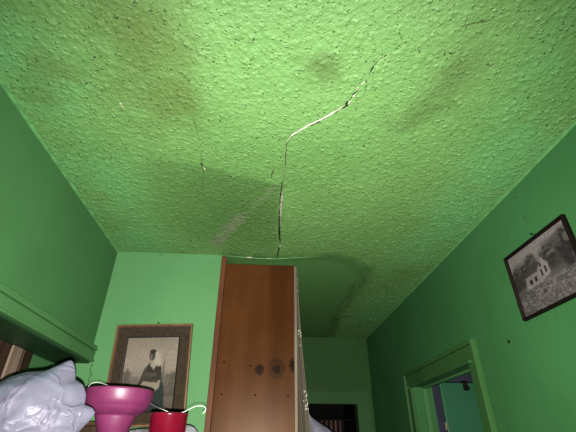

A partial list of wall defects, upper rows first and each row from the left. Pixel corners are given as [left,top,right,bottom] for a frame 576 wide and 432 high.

crack [221,48,398,259]